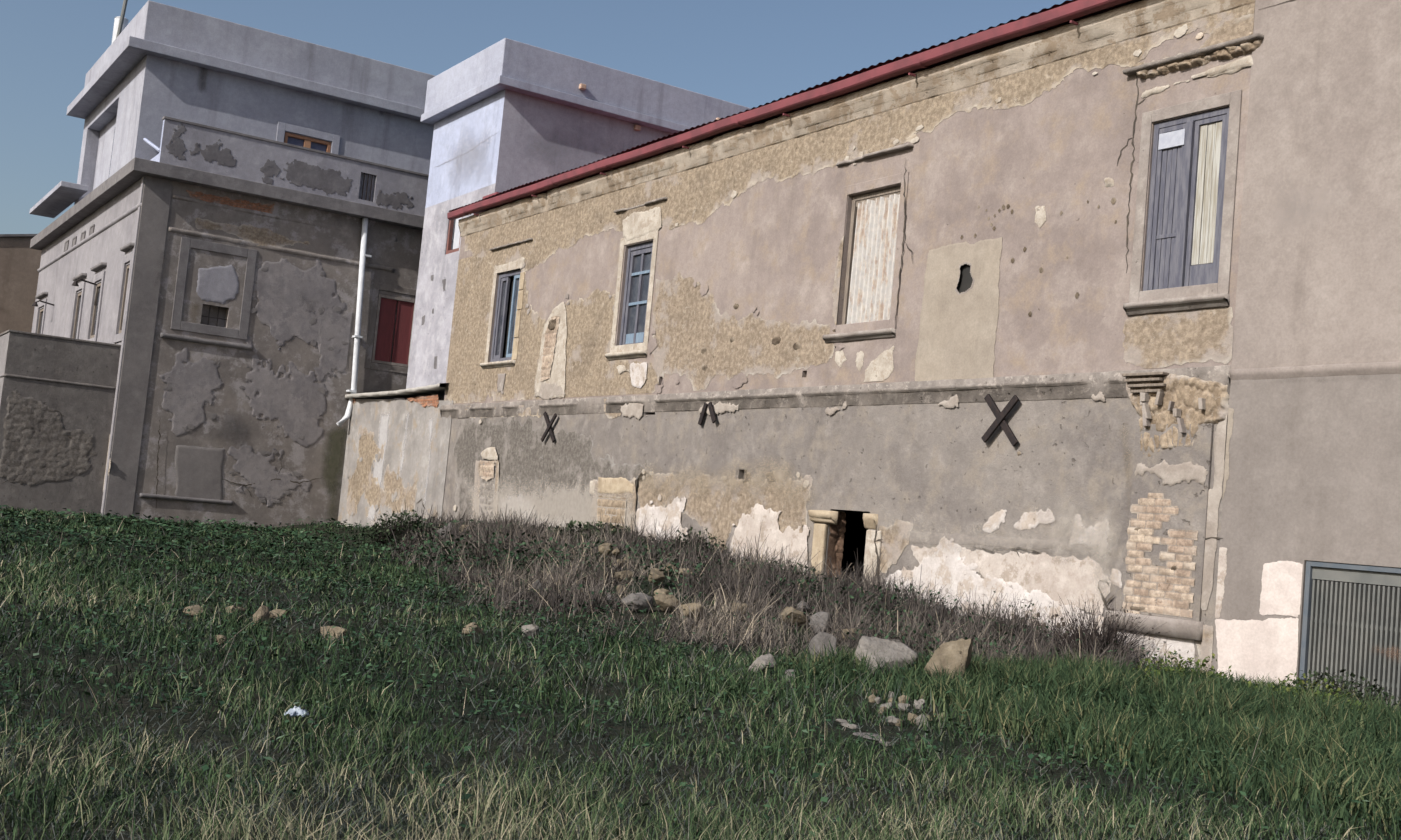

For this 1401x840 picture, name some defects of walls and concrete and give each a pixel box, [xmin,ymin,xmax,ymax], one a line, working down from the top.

peeling [166,123,236,167]
peeling [376,190,414,210]
flaking render [407,3,1262,574]
crack [1117,75,1146,272]
flaking render [878,415,1227,671]